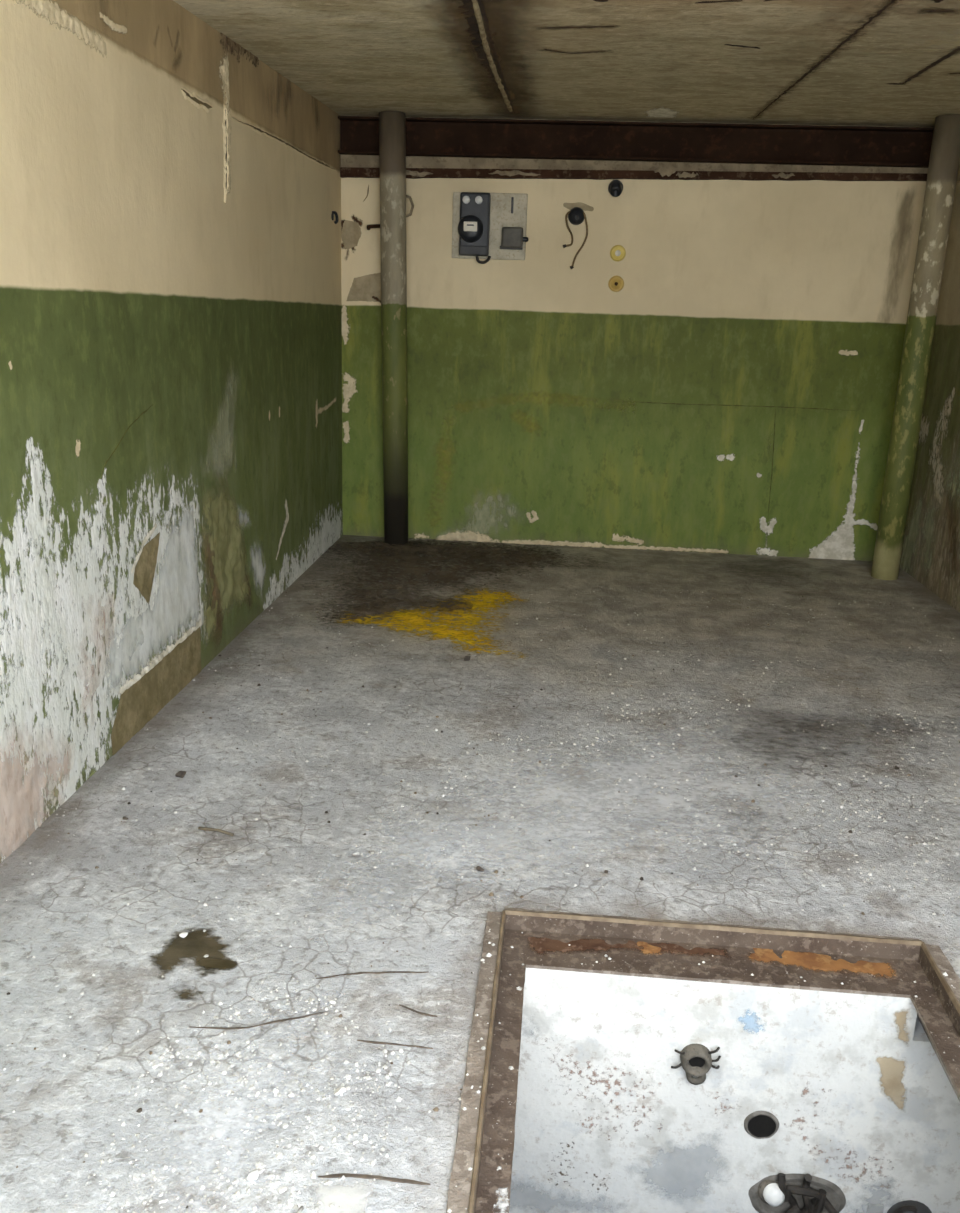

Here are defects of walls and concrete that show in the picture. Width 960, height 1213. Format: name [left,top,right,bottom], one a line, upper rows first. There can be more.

crack [446,0,531,116]
crack [540,0,614,54]
crack [752,0,960,120]
peeling [315,372,358,443]
peeling [809,420,878,560]
peeling [131,524,160,604]
peeling [276,499,289,560]
peeling [111,618,202,755]
damp [178,989,203,1000]
damp [150,928,238,979]
corrosion [527,937,731,959]
corrosion [748,948,895,977]